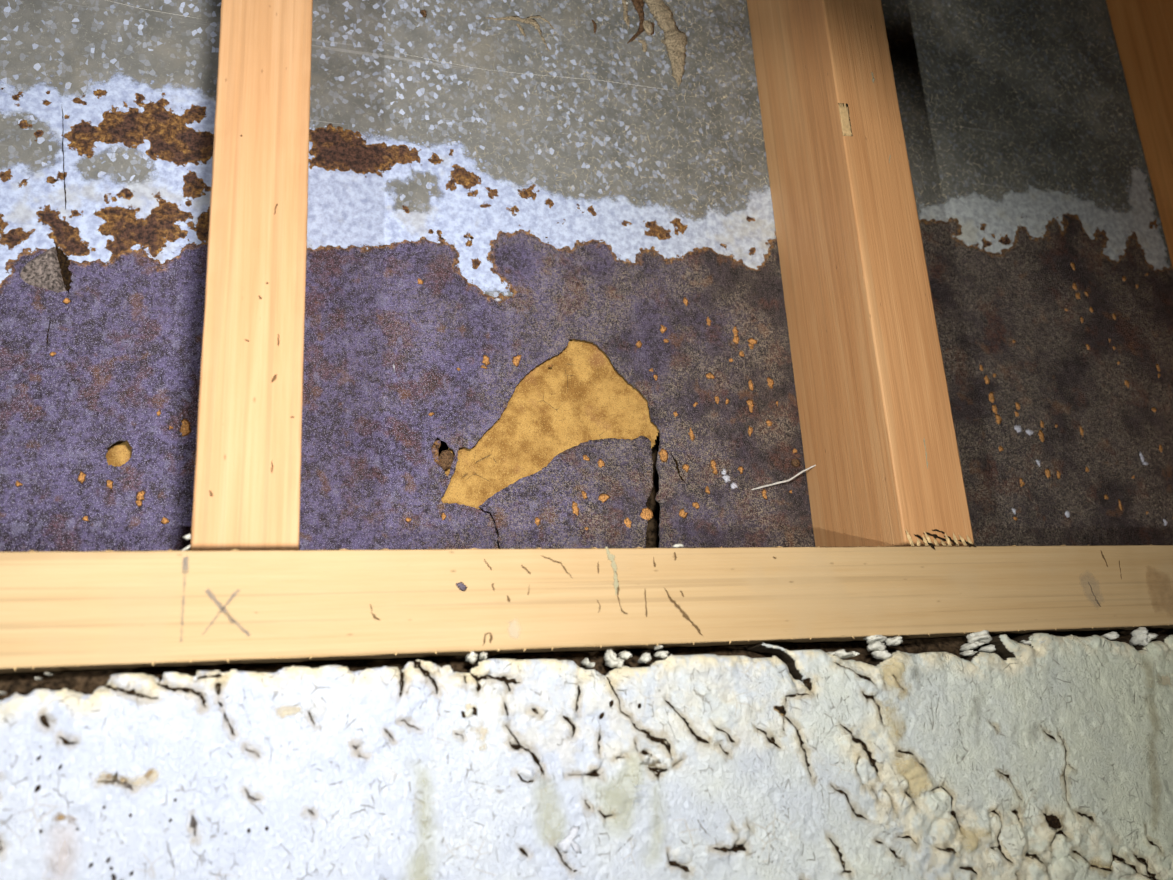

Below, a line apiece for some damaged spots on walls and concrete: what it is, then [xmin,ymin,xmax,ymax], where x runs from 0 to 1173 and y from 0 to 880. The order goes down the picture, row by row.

corrosion [0,69,216,552]
corrosion [919,166,1173,546]
crack [58,736,76,745]
crack [97,779,133,790]
crack [103,674,260,757]
crack [384,661,521,741]
crack [506,725,544,775]
crack [562,662,1160,880]
crack [554,847,578,872]